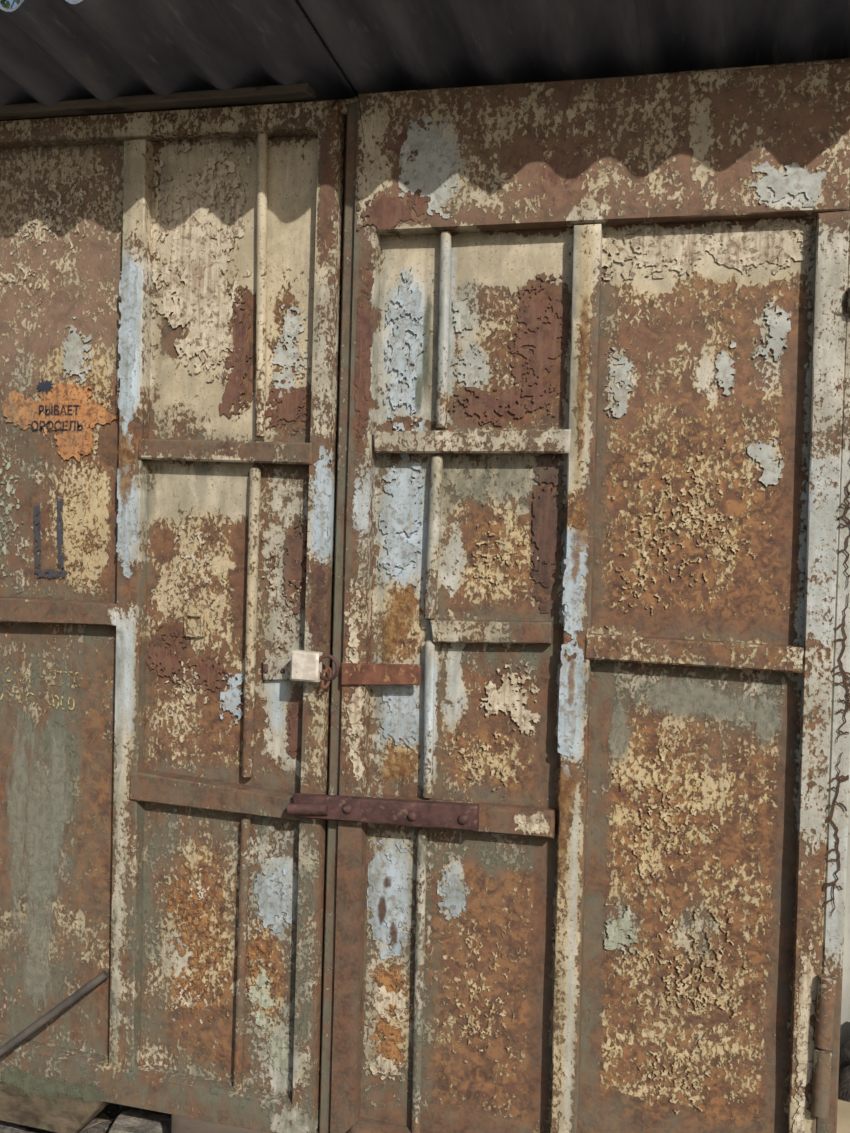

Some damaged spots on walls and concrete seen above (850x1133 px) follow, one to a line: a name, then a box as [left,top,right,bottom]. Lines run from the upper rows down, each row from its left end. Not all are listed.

peeling [399,115,462,219]
peeling [97,138,252,579]
peeling [270,304,310,401]
peeling [384,266,430,431]
corrosion [120,433,133,501]
peeling [312,445,333,564]
corrosion [531,454,587,613]
peeling [166,651,244,724]
corrosion [160,855,227,1022]
corrosion [246,913,275,1023]
corrosion [379,878,397,943]
corrosion [369,957,410,1070]